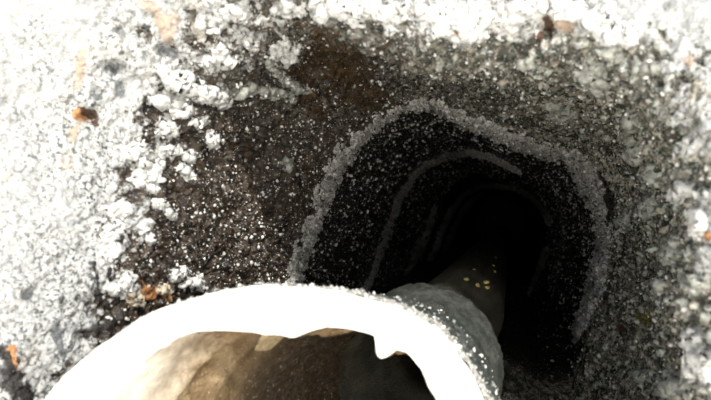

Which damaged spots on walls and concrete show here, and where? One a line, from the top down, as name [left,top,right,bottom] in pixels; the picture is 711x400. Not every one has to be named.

spalling [219,0,662,98]
rust [72,107,88,121]
spalling [119,24,312,221]
spalling [543,103,579,126]
spalling [614,114,709,244]
spalling [137,218,157,246]
spalling [95,198,147,309]
spalling [659,234,683,267]
peeling [154,265,206,297]
spalling [650,279,666,297]
spalling [677,273,701,296]
peeling [255,334,285,351]